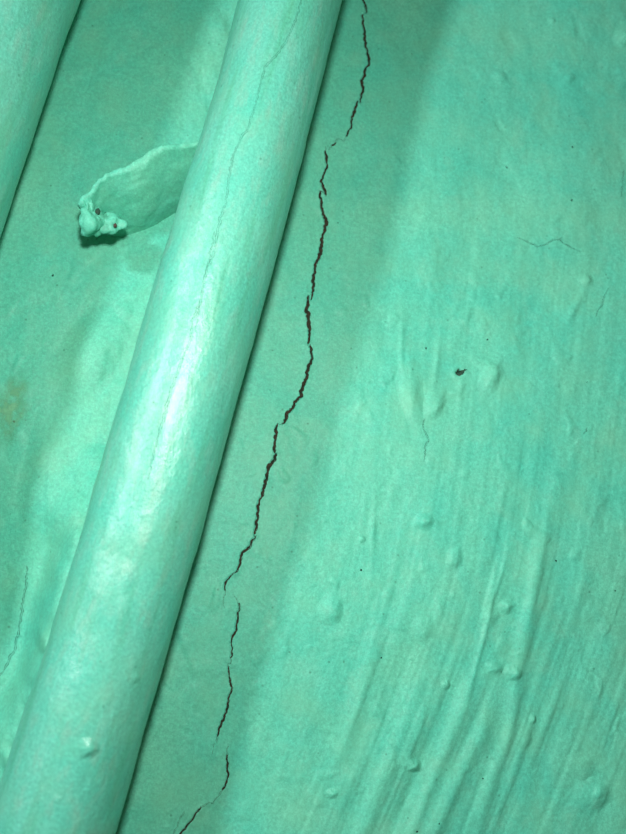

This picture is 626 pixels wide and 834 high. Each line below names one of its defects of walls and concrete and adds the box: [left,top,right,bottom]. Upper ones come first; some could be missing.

crack [147,0,302,480]
crack [173,0,371,834]